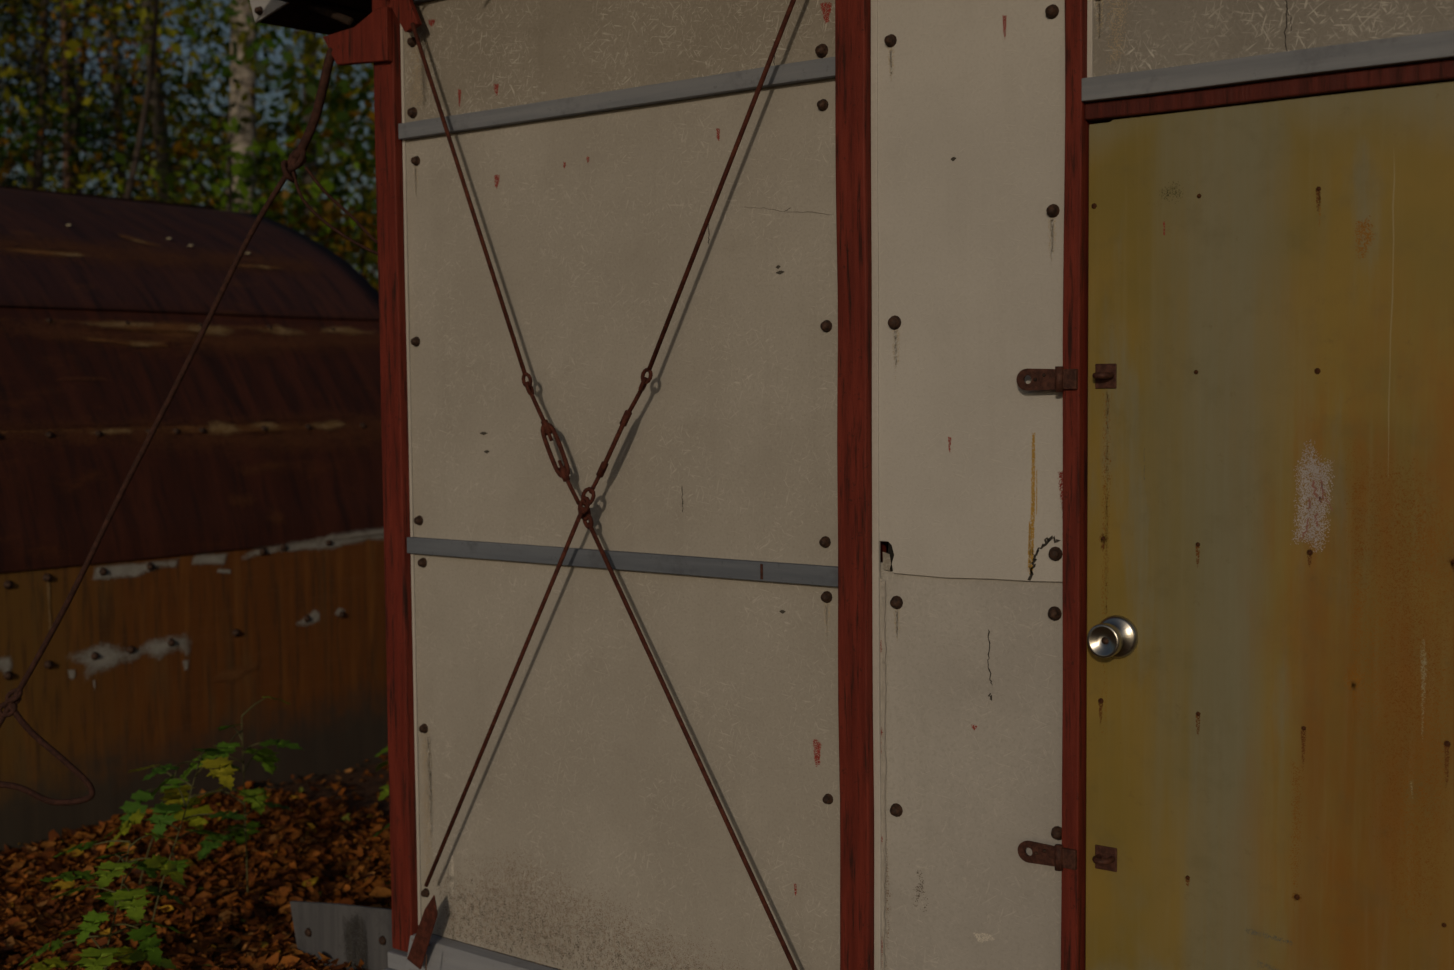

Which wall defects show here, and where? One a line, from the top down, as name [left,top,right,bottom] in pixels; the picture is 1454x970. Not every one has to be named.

crack [1284,0,1292,51]
rust [27,318,379,348]
rust [1028,433,1037,574]
peeling [1290,440,1335,552]
peeling [65,633,192,687]
damp [420,730,742,970]